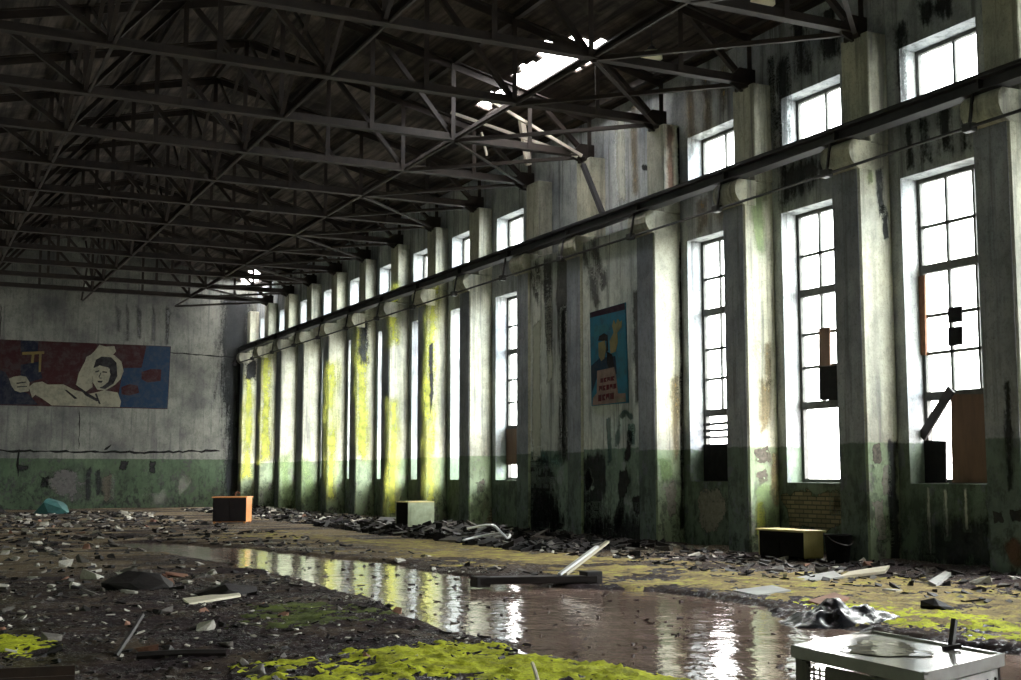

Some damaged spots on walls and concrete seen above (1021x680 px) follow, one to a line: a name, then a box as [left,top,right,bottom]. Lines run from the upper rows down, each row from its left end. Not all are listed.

leakage [917,0,953,26]
leakage [895,20,908,101]
peeling [41,465,112,502]
leakage [584,430,640,539]
flaking render [754,446,841,533]